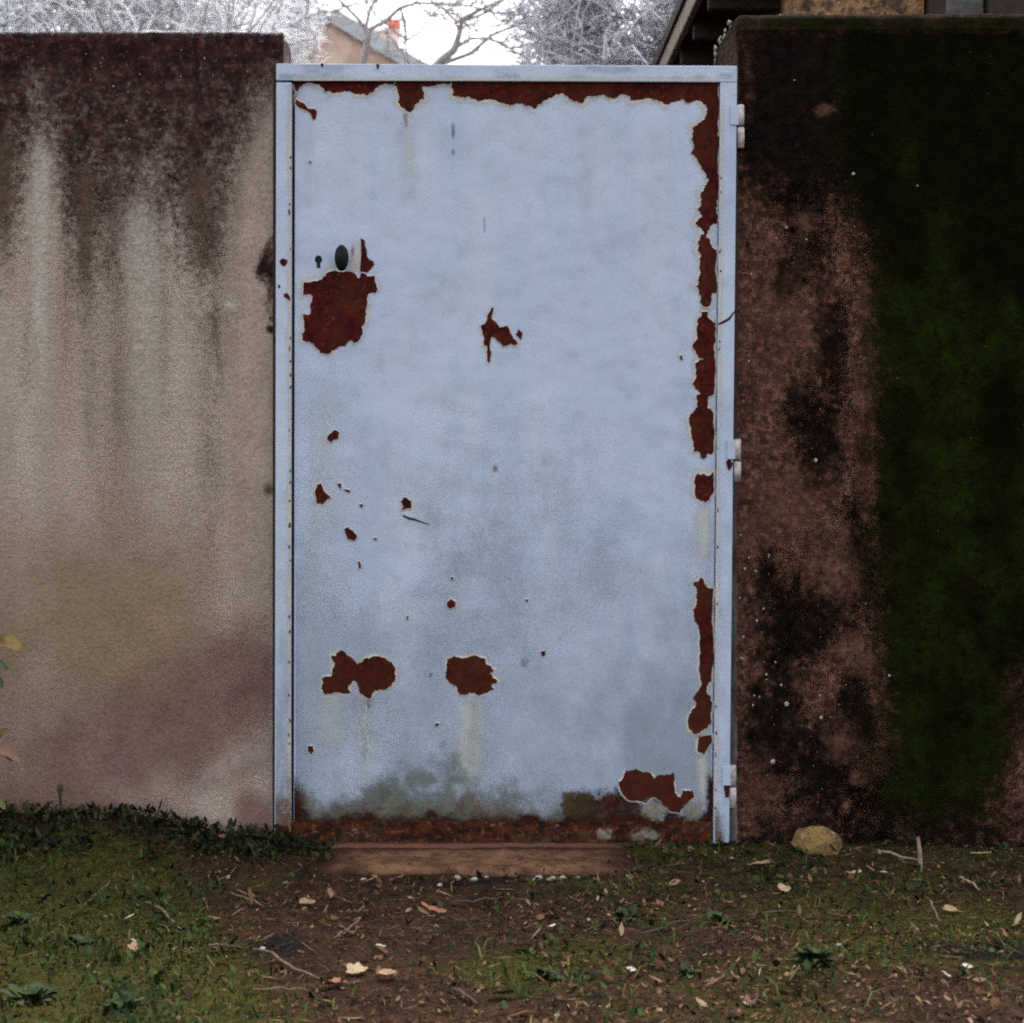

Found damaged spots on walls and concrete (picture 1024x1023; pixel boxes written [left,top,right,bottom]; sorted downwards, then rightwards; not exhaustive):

leakage [0,32,283,565]
corrosion [278,64,733,554]
leakage [850,33,1024,306]
corrosion [275,574,730,842]